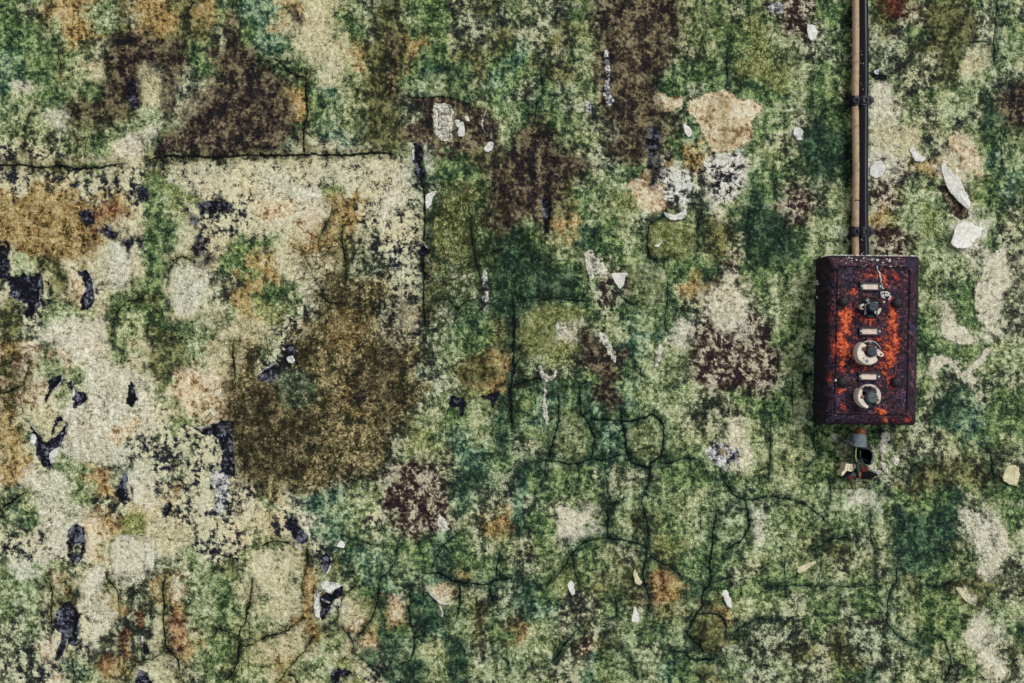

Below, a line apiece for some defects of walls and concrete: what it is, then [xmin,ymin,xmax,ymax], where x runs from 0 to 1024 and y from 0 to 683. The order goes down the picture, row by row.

crack [0,107,120,174]
mould [63,0,296,166]
crack [145,57,519,325]
peeling [653,89,763,200]
spalling [0,241,44,319]
spalling [25,373,88,469]
water stain [209,295,423,514]
water stain [381,455,453,538]
crack [507,292,973,663]
peeling [44,515,152,660]
spalling [314,541,345,620]
crack [212,531,513,683]